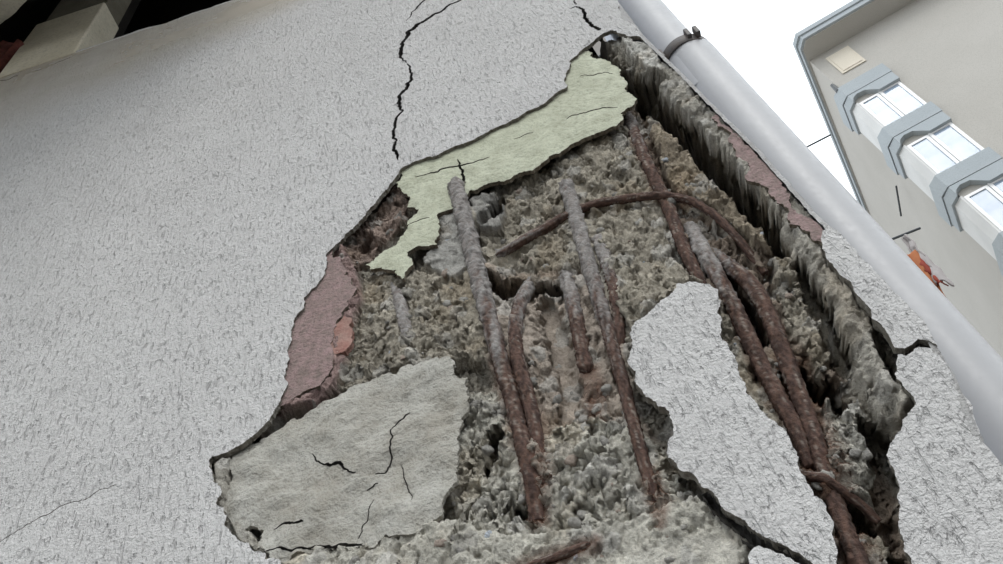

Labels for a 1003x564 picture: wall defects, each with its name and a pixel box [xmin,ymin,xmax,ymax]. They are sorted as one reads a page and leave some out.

crack [569,0,603,42]
crack [392,0,461,160]
crack [416,157,488,181]
spalling [212,37,915,564]
crack [892,344,941,367]
crack [264,412,413,552]
crack [701,492,806,564]